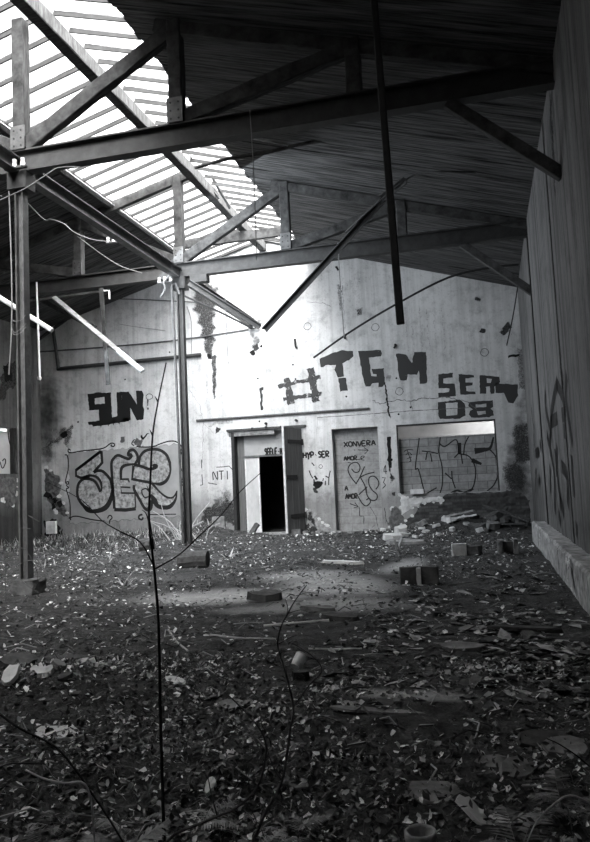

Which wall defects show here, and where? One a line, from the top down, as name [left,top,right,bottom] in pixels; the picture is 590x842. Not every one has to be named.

damp [193,293,217,398]
flaking render [44,466,69,517]
flaking render [388,489,531,529]